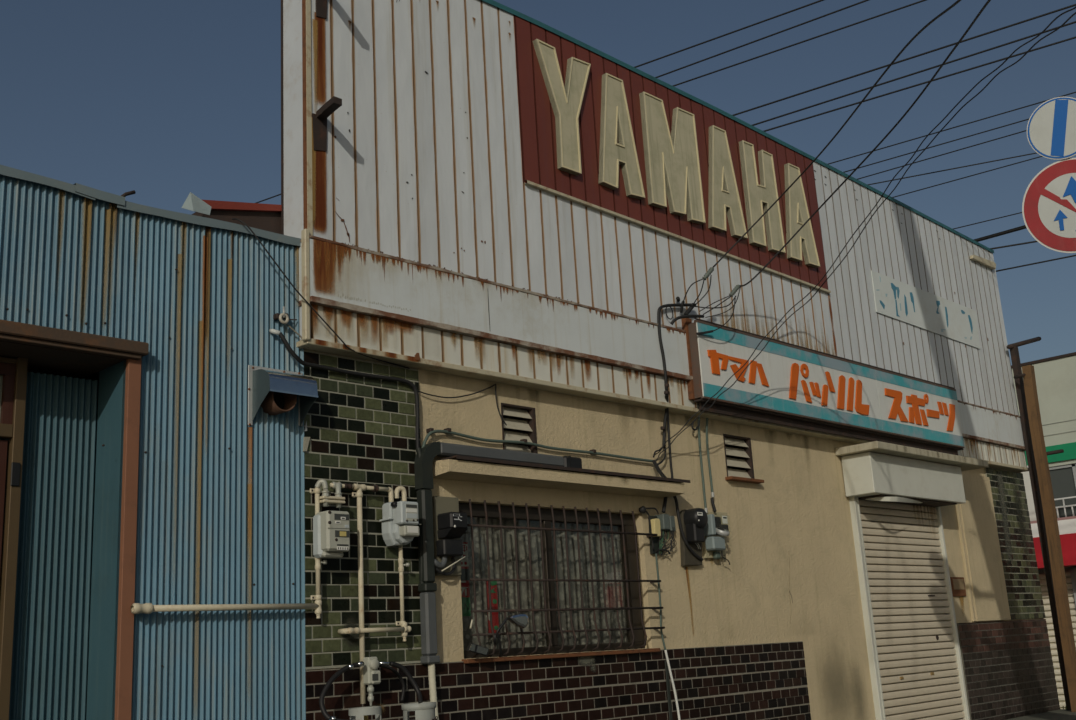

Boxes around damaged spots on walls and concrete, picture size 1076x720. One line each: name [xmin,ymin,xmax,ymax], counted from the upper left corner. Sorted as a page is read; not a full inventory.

corrosion [313,12,326,104]
corrosion [312,121,464,293]
corrosion [82,197,118,311]
corrosion [311,304,413,335]
corrosion [529,349,590,376]
corrosion [481,281,685,335]
corrosion [195,226,211,687]